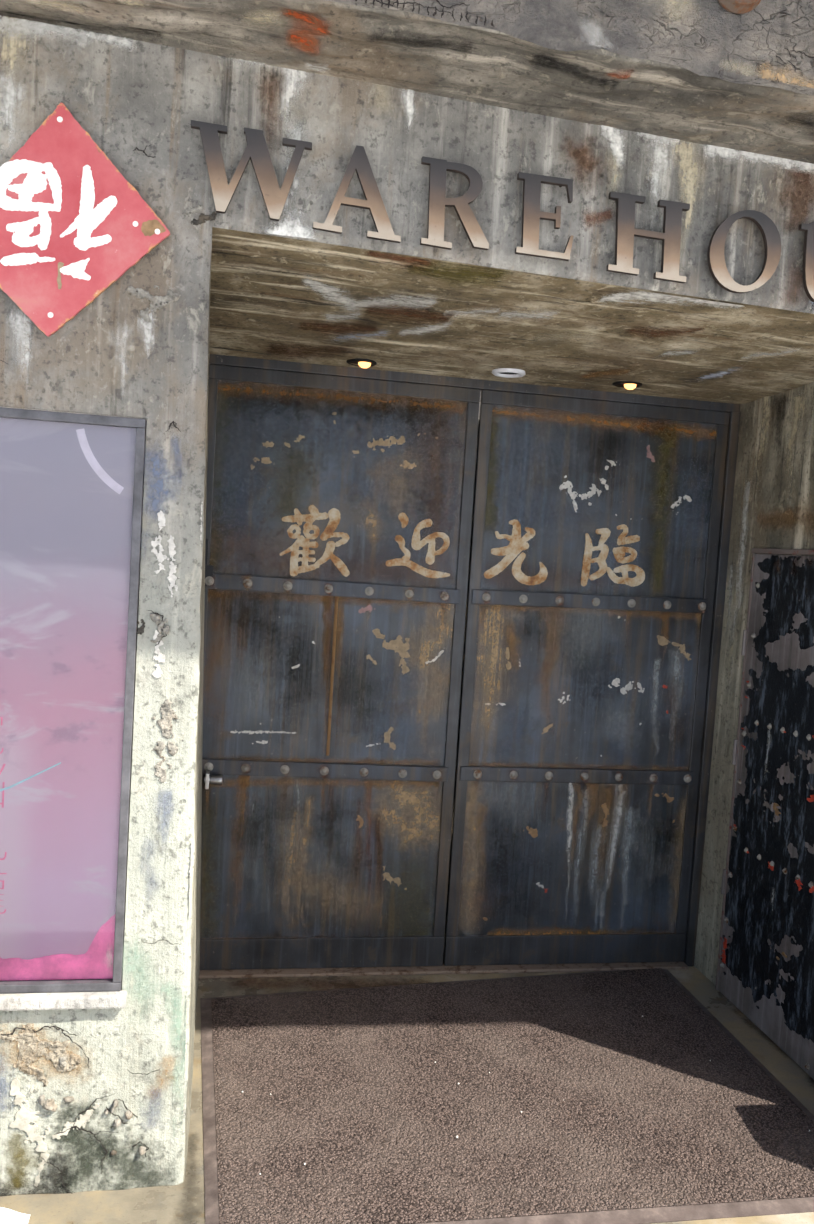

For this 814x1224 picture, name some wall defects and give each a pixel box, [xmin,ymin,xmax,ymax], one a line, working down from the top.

crack [355,0,495,27]
crack [775,48,814,83]
peeling [250,435,305,470]
peeling [352,433,438,454]
peeling [559,460,617,512]
rust [492,409,717,437]
water stain [734,395,805,620]
rust [477,592,522,729]
rust [365,780,452,895]
water stain [568,783,633,891]
spalling [0,1023,99,1187]
water stain [41,1106,173,1194]